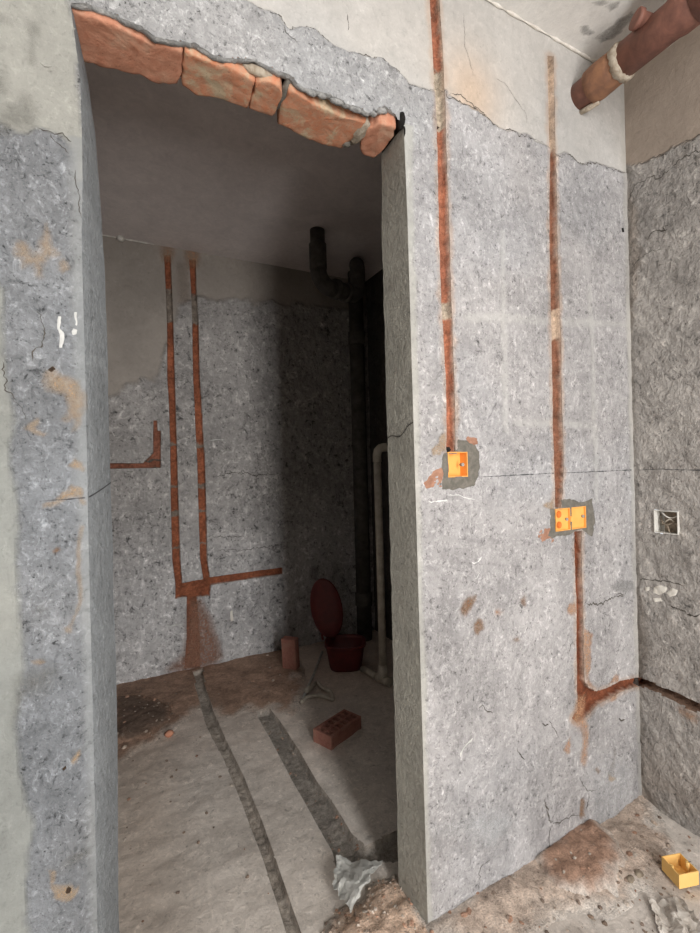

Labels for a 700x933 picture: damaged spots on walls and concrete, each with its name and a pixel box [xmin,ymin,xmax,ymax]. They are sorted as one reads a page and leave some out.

spalling [71,1,405,132]
crack [544,779,595,847]